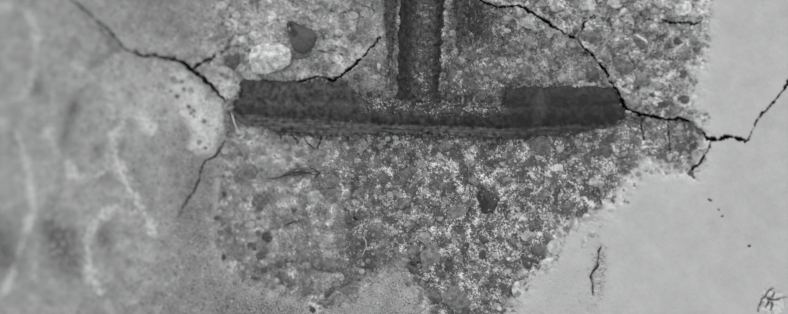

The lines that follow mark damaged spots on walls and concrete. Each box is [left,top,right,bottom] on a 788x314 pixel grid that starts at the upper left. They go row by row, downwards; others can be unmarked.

crack [71,0,224,99]
crack [298,37,381,82]
crack [480,0,788,170]
crack [179,133,228,215]
spalling [160,0,716,314]
peeling [758,283,788,314]